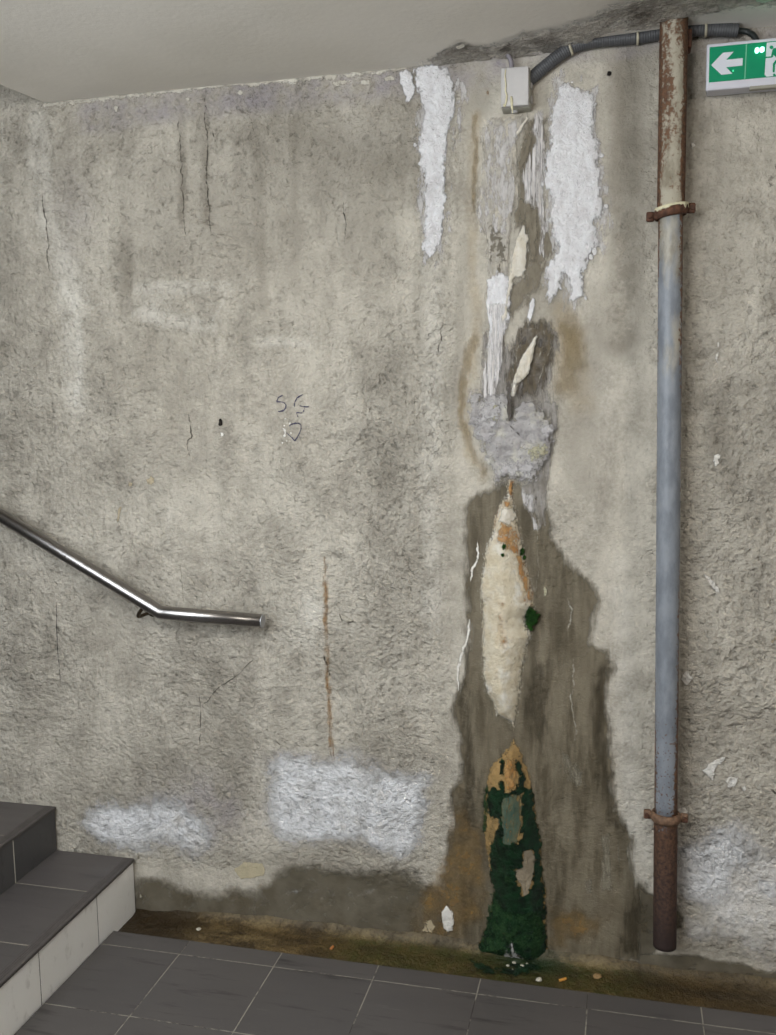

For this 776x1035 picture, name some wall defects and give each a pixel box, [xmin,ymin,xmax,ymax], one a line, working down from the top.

spalling [487,222,506,274]
spalling [504,319,556,399]
water stain [135,64,776,978]